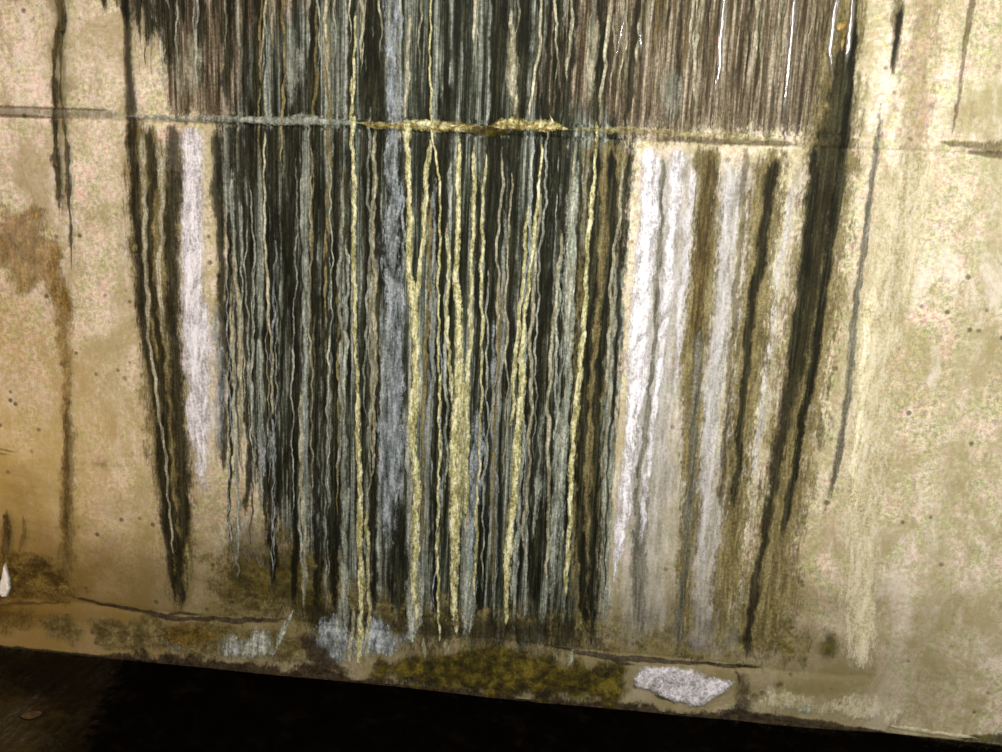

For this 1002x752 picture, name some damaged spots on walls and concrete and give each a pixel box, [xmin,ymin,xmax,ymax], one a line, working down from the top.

damp [954,0,976,125]
damp [0,0,107,263]
damp [102,0,942,668]
damp [0,511,12,598]
damp [0,648,1002,752]
spalling [635,666,732,706]